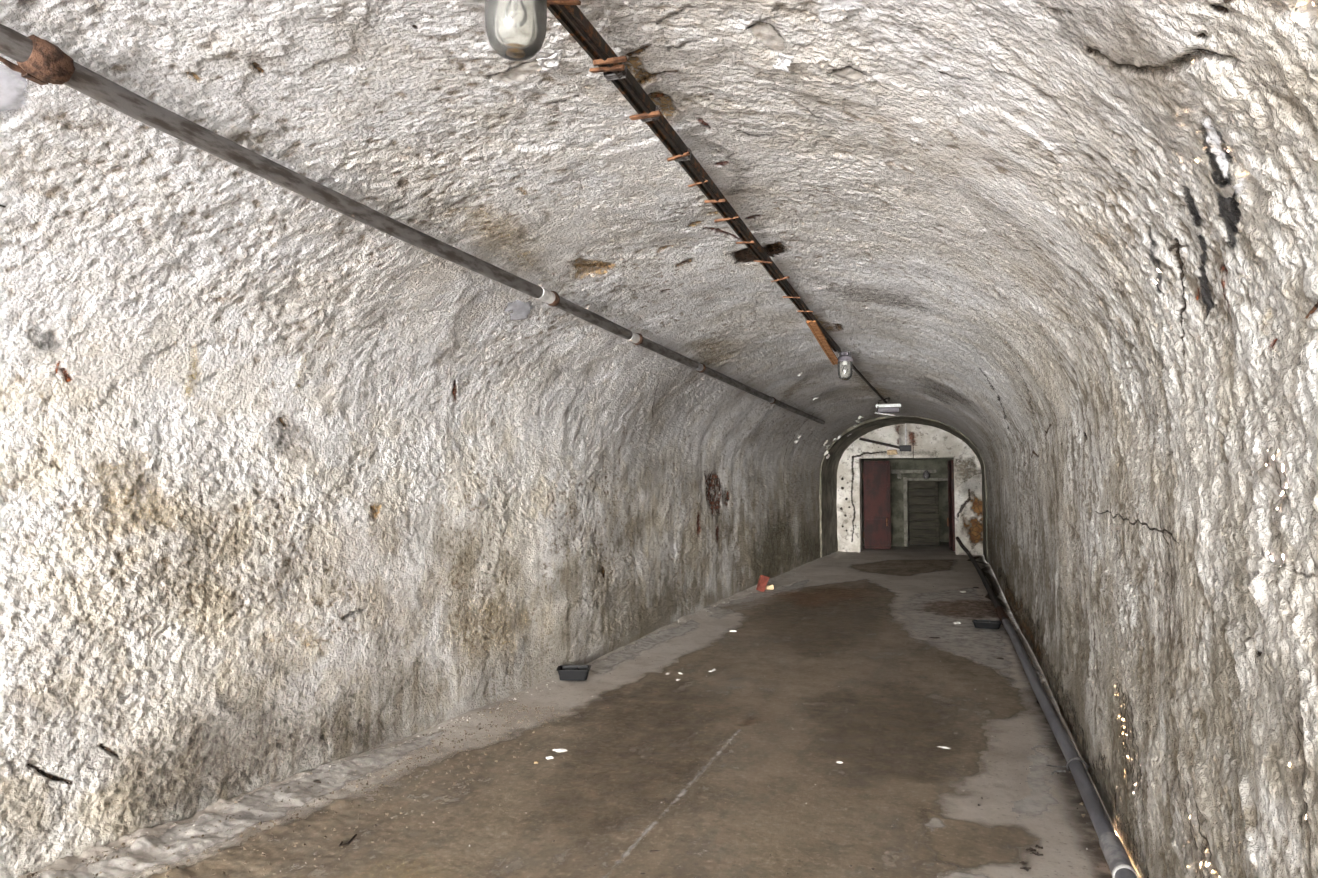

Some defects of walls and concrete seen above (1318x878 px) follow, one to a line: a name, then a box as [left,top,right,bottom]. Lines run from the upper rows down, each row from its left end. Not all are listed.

rust [626,44,678,117]
crack [1087,47,1236,77]
damp [1199,118,1243,249]
rust [688,211,742,241]
damp [1149,232,1162,293]
damp [1184,187,1214,315]
crack [1095,510,1179,544]